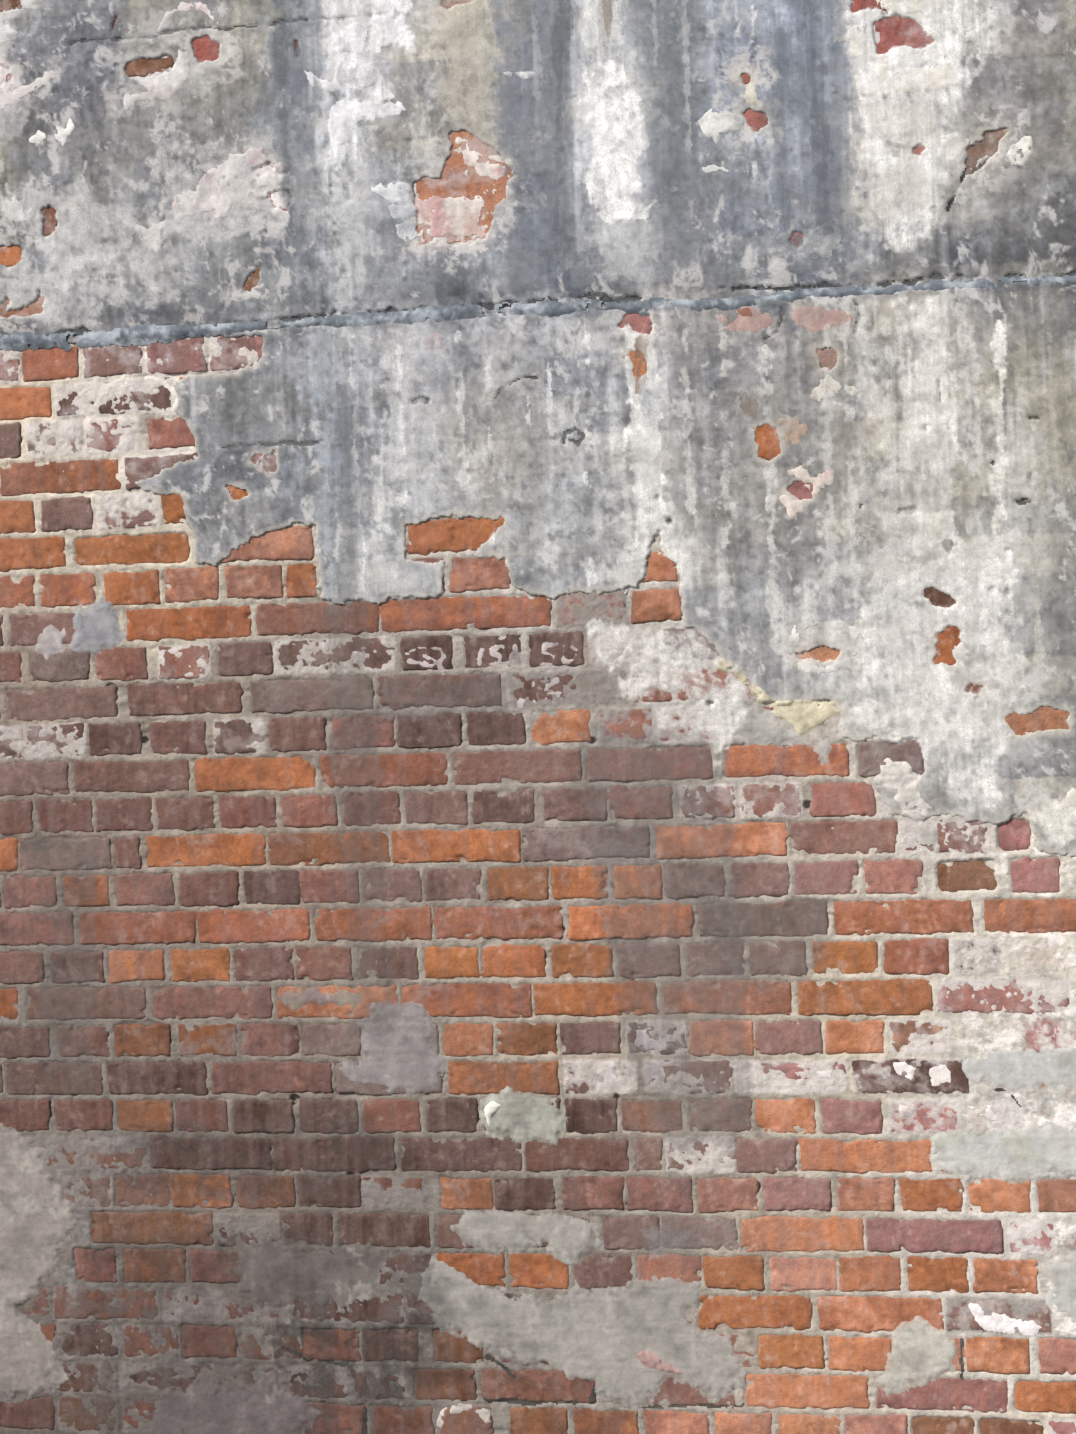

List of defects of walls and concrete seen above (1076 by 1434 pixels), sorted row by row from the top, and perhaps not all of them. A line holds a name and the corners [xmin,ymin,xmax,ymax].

water stain [7,0,418,320]
spalling [371,131,516,247]
water stain [440,0,652,287]
water stain [652,0,693,189]
spalling [834,0,965,97]
water stain [313,328,471,604]
water stain [525,364,555,445]
water stain [584,419,595,450]
spalling [75,533,190,566]
peeling [873,758,997,892]
peeling [968,1303,1042,1336]
spalling [911,1380,1076,1434]